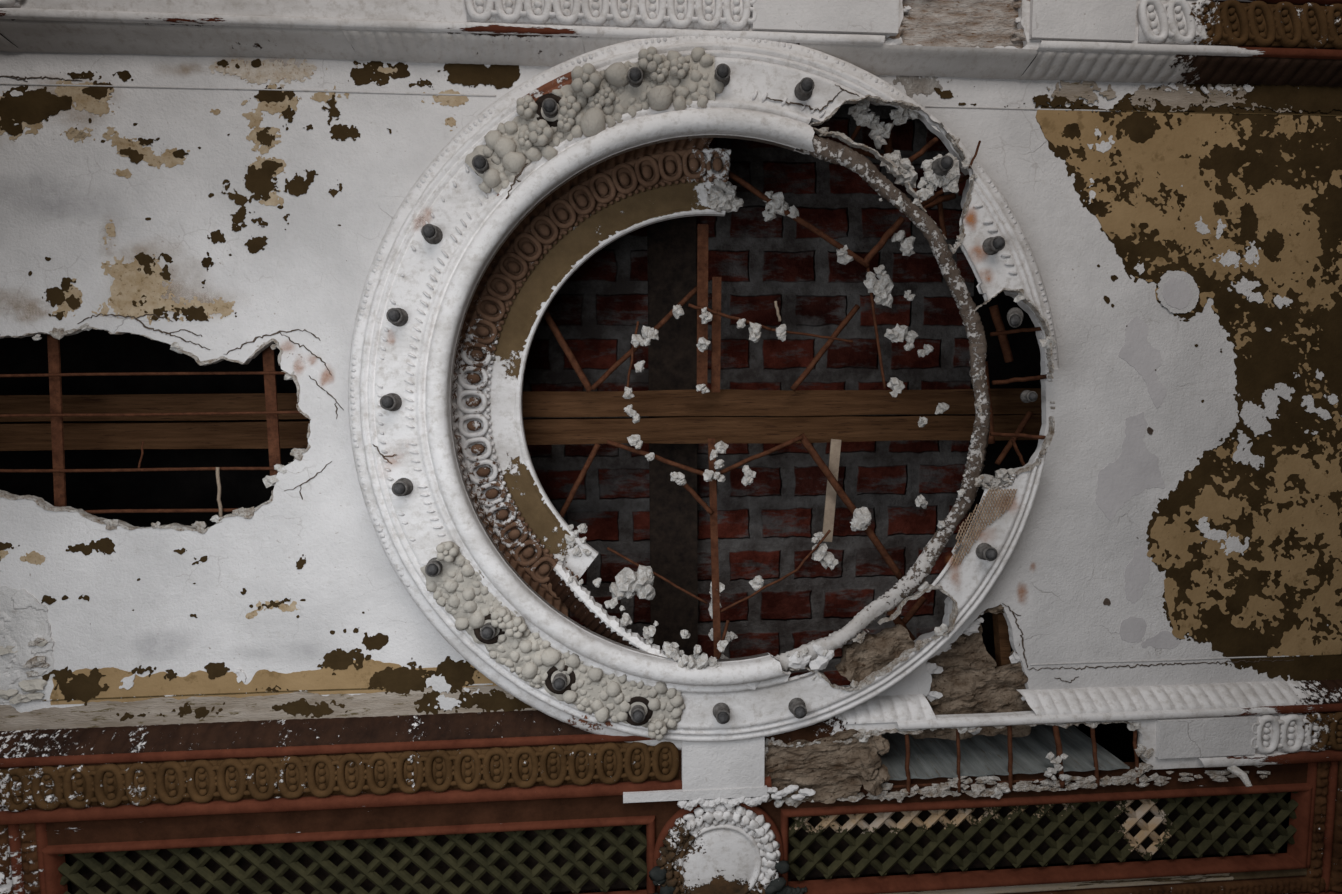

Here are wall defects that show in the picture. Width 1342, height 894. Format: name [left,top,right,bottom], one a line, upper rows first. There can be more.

spalling [884,0,1030,49]
spalling [810,76,977,254]
peeling [0,58,520,556]
crack [77,313,343,419]
peeling [1004,80,1342,681]
crack [285,461,332,500]
peeling [0,542,46,565]
peeling [41,595,90,605]
peeling [174,548,207,565]
peeling [240,588,306,619]
peeling [0,612,537,731]
spalling [764,581,1154,808]